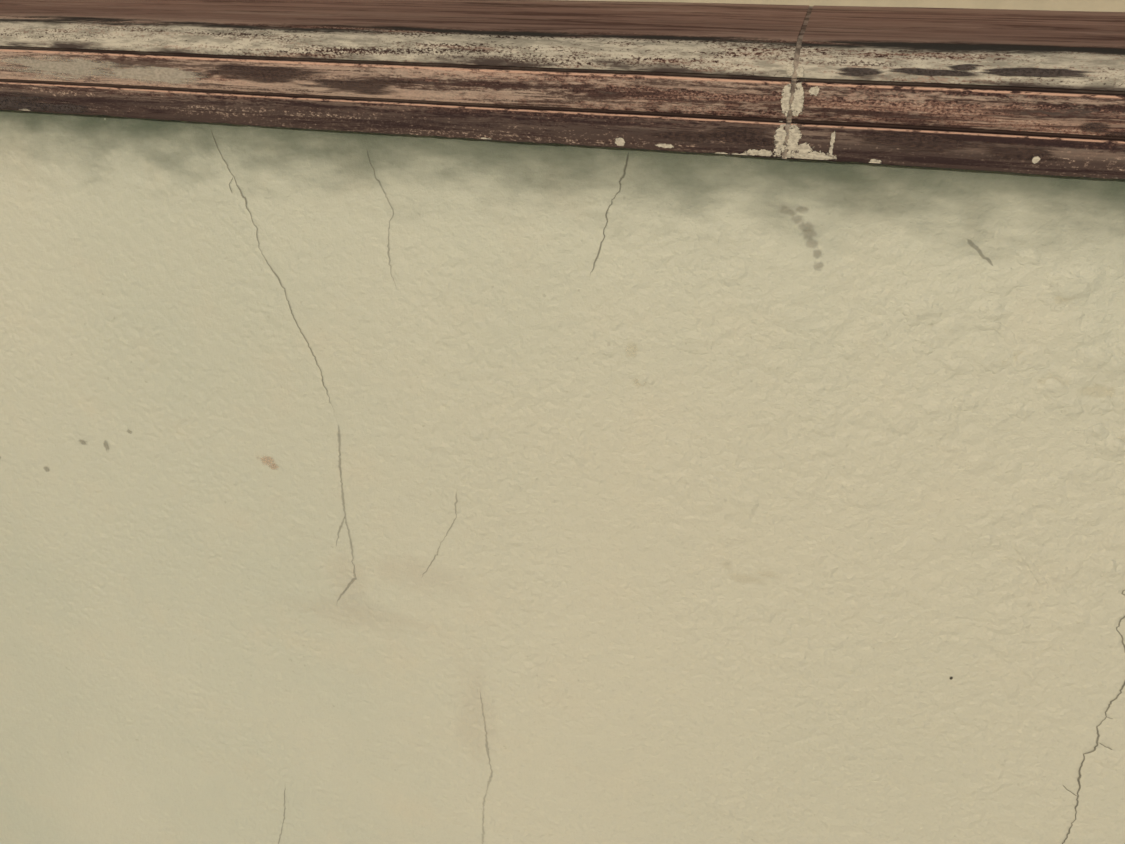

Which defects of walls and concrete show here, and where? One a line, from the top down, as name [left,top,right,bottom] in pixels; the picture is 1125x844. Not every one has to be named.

peeling [653,63,837,161]
peeling [864,132,1058,164]
crack [1062,682,1125,844]